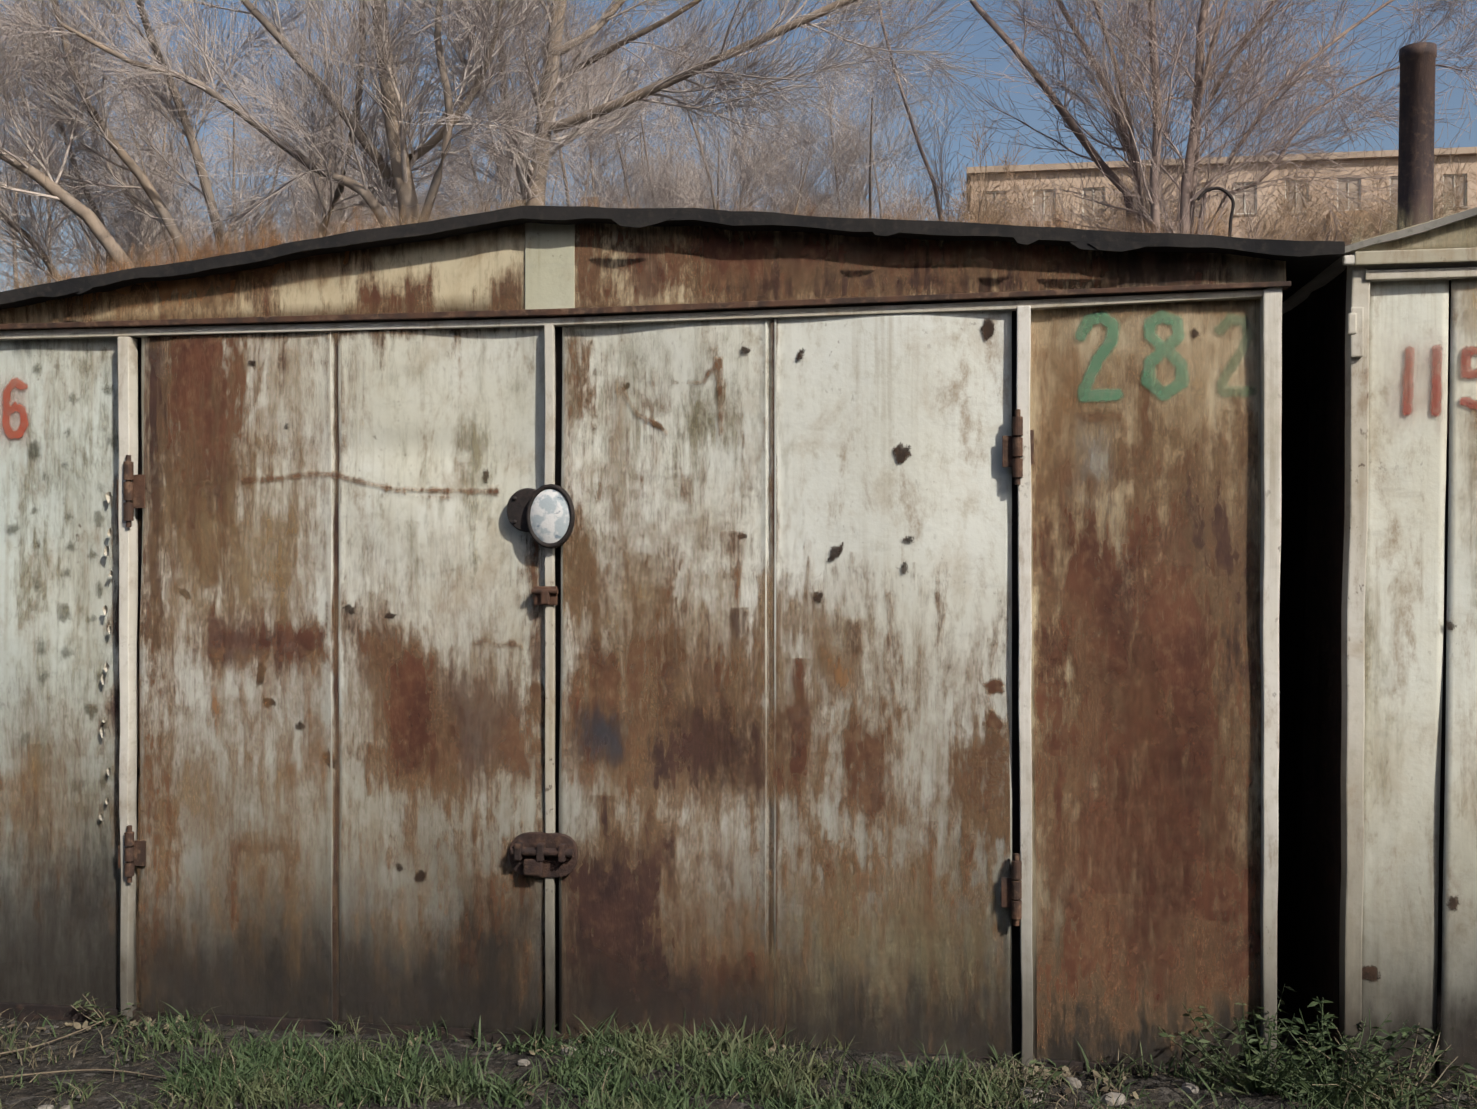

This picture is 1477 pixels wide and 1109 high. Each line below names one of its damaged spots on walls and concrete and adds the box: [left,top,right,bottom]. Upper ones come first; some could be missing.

corrosion [575,201,1247,318]
corrosion [0,210,921,1045]
corrosion [935,632,1010,890]
corrosion [1032,348,1261,1048]